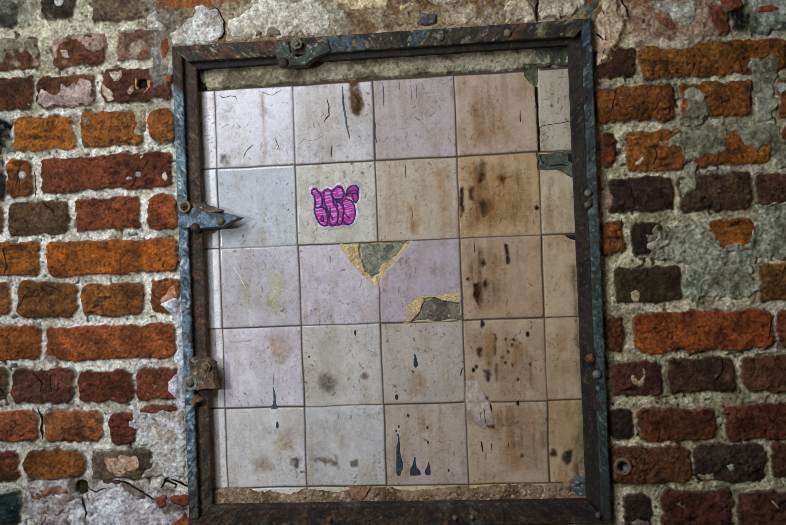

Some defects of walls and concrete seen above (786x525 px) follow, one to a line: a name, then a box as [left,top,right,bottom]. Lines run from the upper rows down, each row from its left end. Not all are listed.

flaking render [429,0,478,27]
flaking render [504,0,599,23]
rust [349,80,364,115]
leakage [0,120,13,166]
peeling [659,55,786,198]
spalling [342,240,411,287]
spalling [646,202,786,302]
spalling [406,293,461,322]
flaking render [92,409,187,484]
crack [81,477,188,520]
spalling [154,494,189,525]